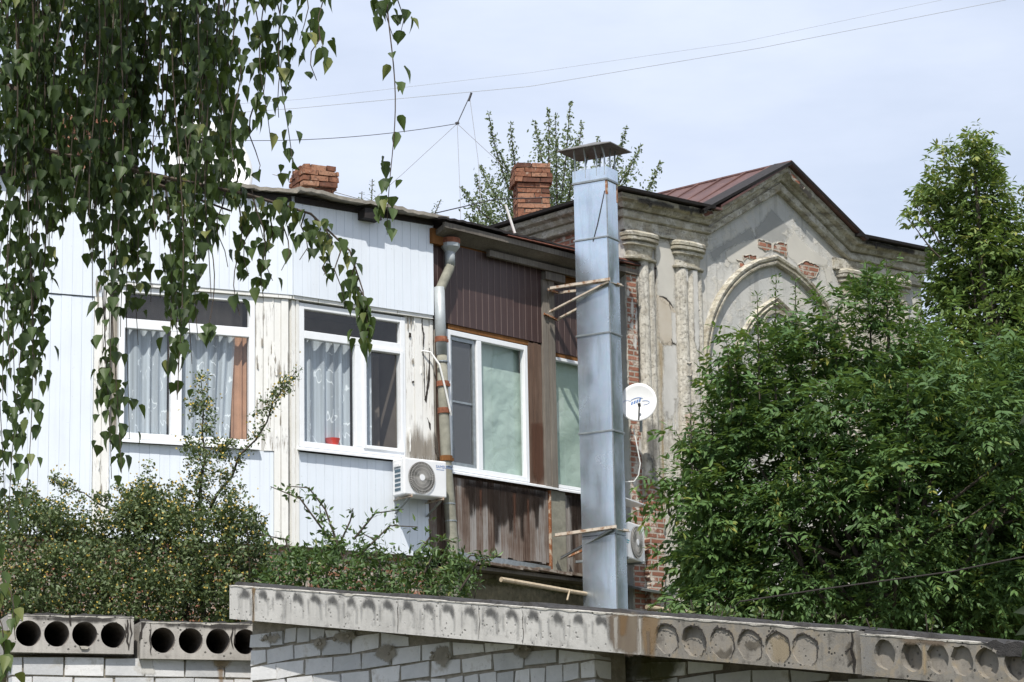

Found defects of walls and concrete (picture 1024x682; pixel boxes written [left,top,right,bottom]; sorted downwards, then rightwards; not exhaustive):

peeling [725,230,832,285]
flaking render [625,264,641,386]
leakage [465,479,545,543]
leakage [568,495,582,553]
flaking render [628,419,667,612]
leakage [242,589,538,621]
leakage [554,612,583,623]
leakage [596,613,638,654]